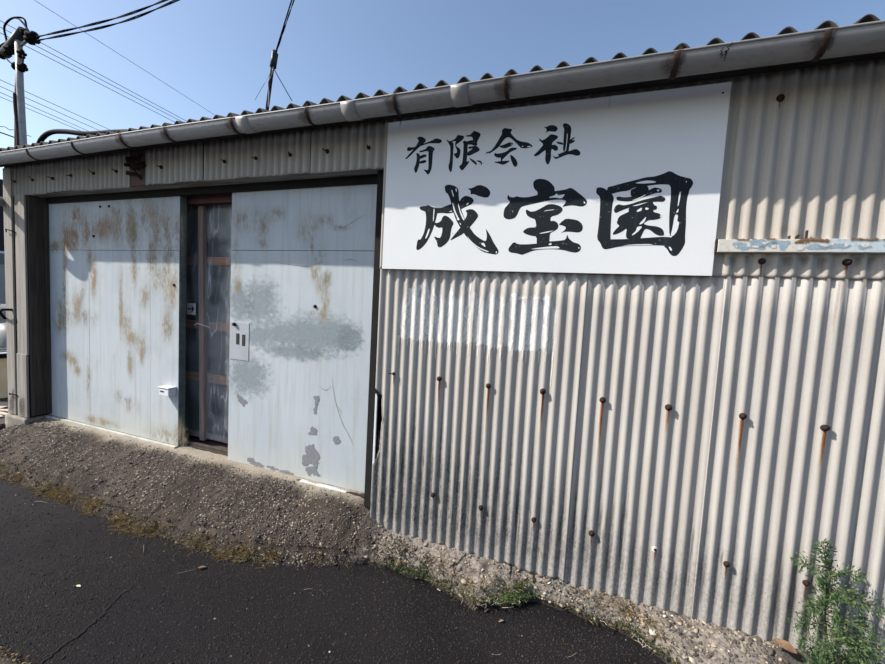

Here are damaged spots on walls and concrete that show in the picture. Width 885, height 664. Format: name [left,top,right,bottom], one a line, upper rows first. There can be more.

rust [52,210,136,270]
peeling [733,239,872,251]
peeling [302,426,320,477]